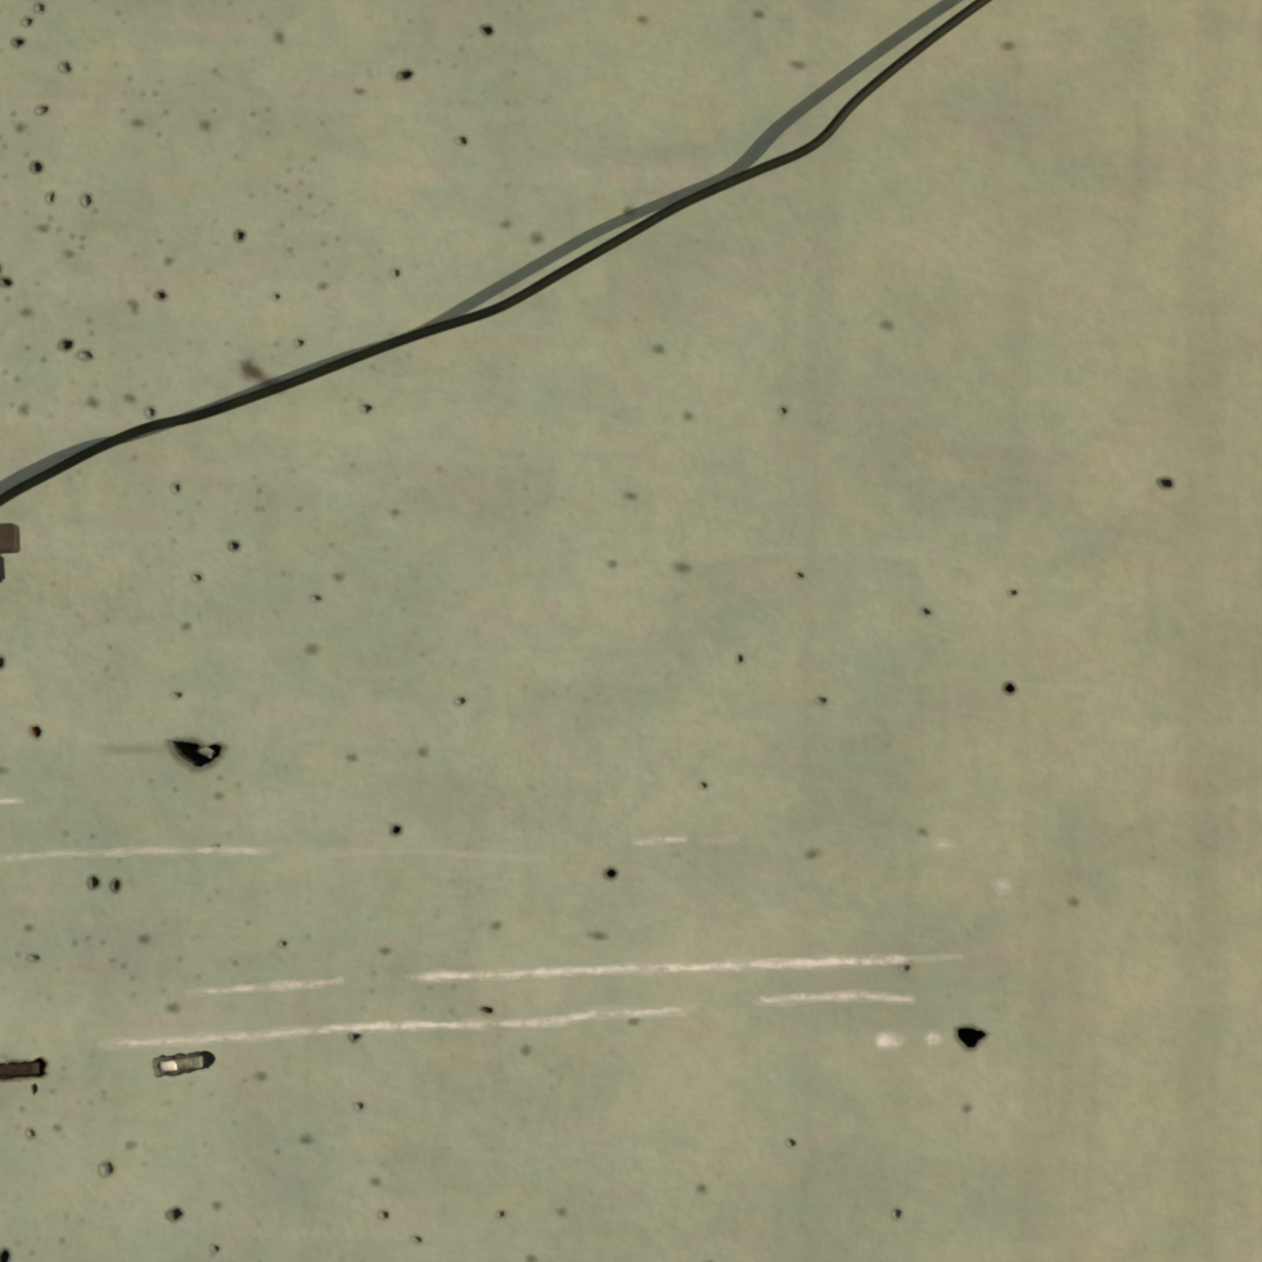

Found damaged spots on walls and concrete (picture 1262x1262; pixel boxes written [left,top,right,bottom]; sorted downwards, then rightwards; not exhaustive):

spalling [172,741,222,767]